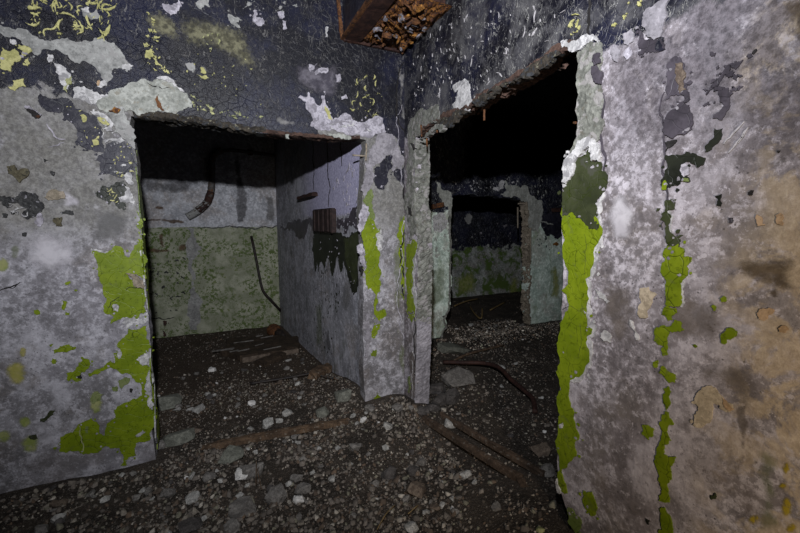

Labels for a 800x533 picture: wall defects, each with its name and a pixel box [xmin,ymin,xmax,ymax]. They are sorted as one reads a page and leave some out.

peeling [276,0,297,30]
peeling [0,0,266,466]
peeling [280,0,670,494]
peeling [629,49,757,533]
water stain [742,262,788,296]
water stain [738,407,748,433]
peeling [567,490,599,533]